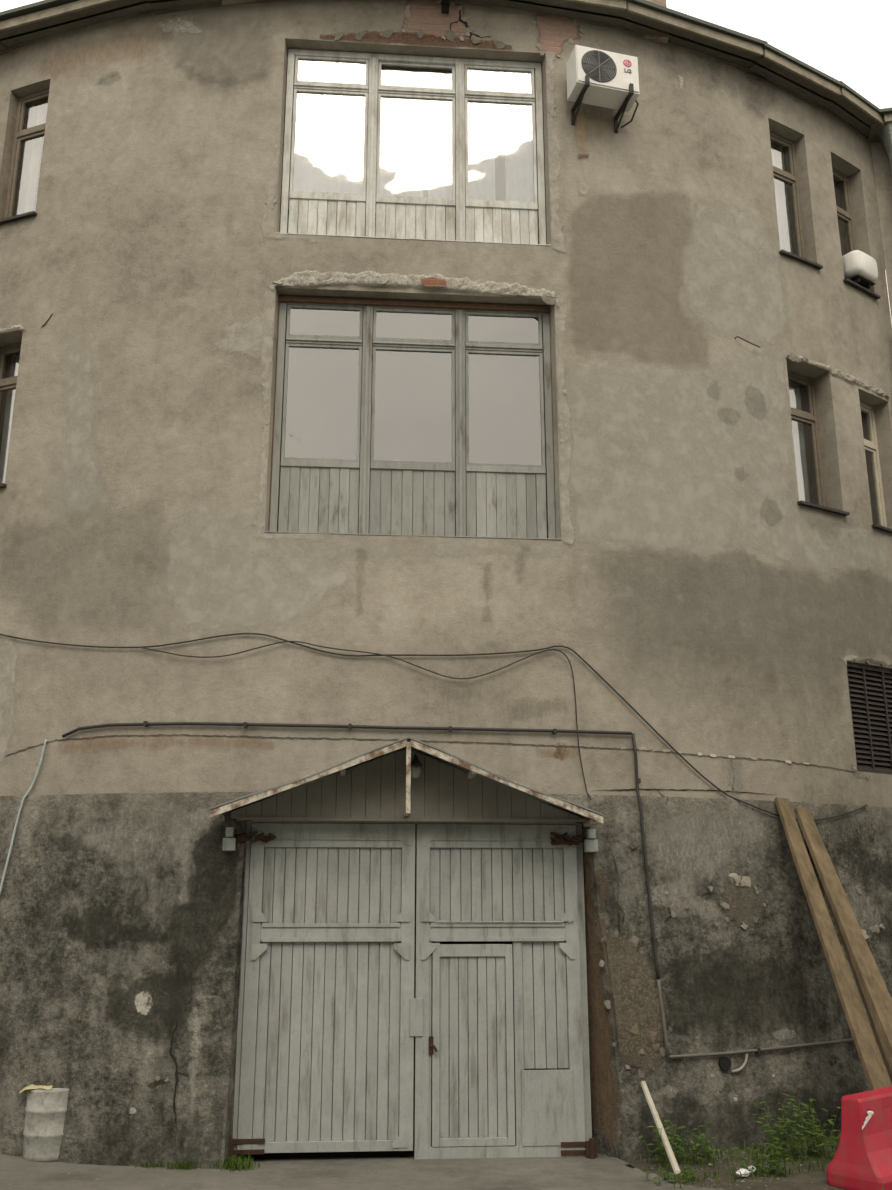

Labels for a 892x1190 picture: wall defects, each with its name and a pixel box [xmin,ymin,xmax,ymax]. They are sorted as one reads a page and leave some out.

flaking render [401,0,473,42]
flaking render [421,277,446,287]
flaking render [651,873,766,930]
water stain [60,808,246,1165]
crack [169,1021,189,1129]